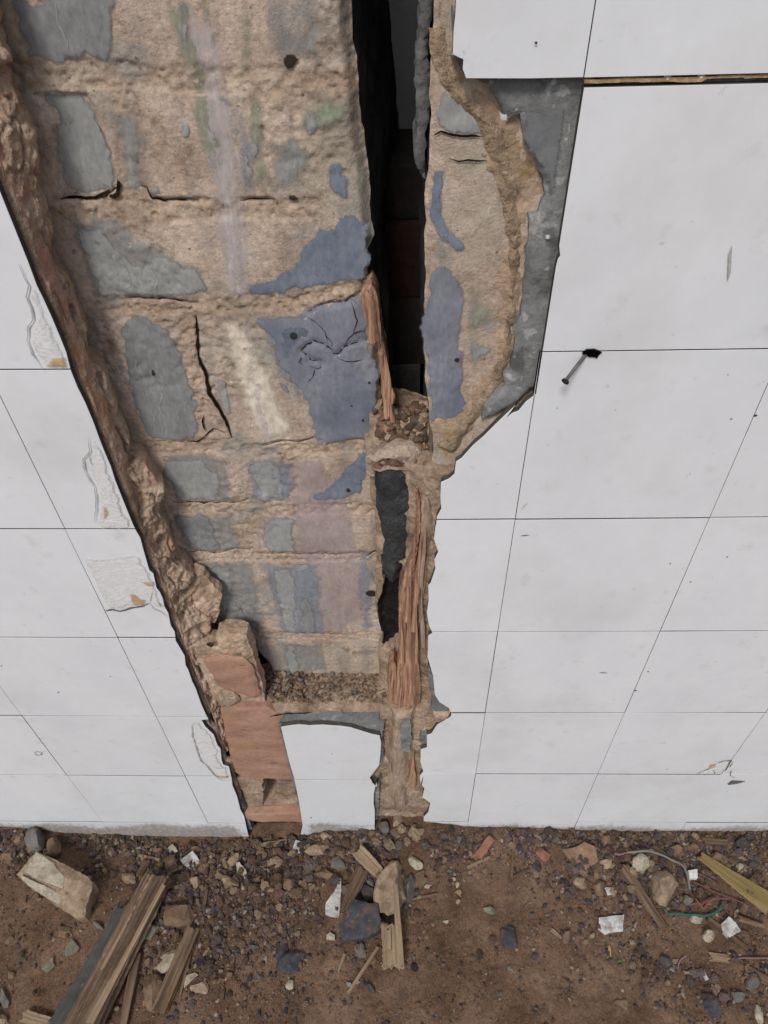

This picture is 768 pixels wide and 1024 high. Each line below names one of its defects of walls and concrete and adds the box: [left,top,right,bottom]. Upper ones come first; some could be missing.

spalling [284,54,298,68]
crack [434,131,487,162]
flaking render [524,108,570,193]
crack [61,180,197,201]
crack [128,296,232,442]
crack [299,293,367,380]
spalling [82,442,129,528]
spalling [86,556,168,618]
spalling [366,571,399,644]
peeling [427,660,448,712]
spalling [191,723,298,807]
peeling [400,716,427,752]